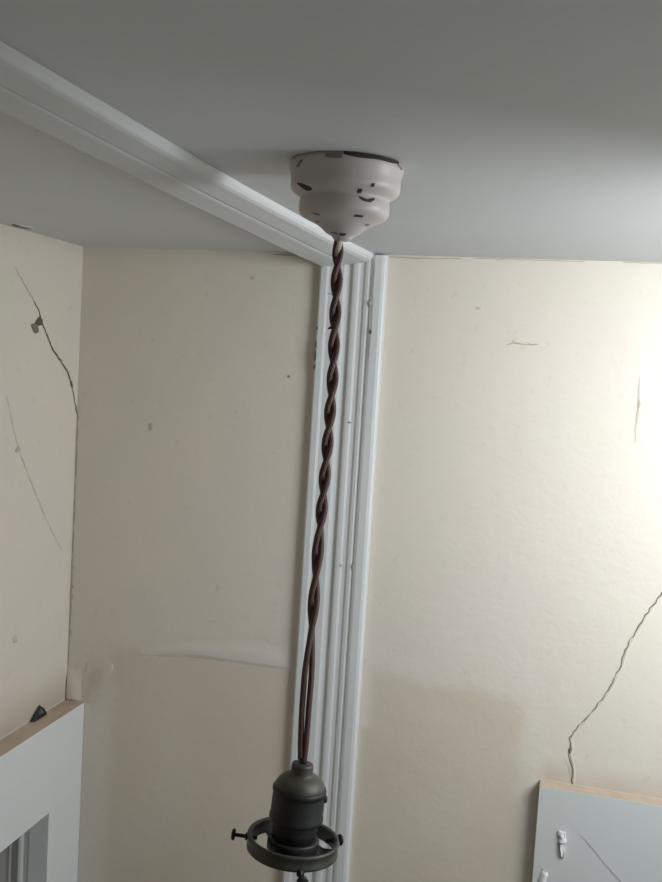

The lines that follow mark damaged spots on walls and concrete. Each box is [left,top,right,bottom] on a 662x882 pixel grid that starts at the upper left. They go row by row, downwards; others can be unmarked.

crack [7,269,79,667]
crack [565,592,662,784]